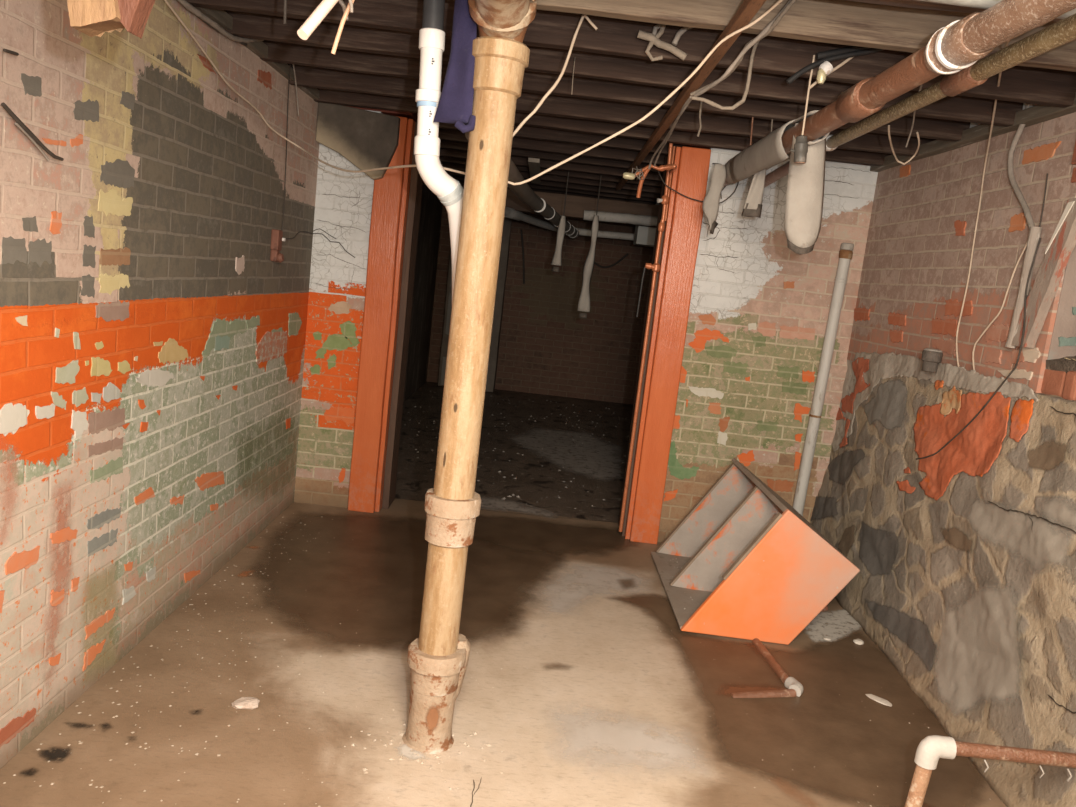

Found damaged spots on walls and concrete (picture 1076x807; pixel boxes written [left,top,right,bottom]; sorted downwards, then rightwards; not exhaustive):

peeling [2,211,62,267]
peeling [81,159,135,322]
peeling [202,312,302,364]
peeling [310,301,360,375]
peeling [0,332,188,484]
peeling [664,366,730,501]
peeling [896,380,1034,500]
peeling [5,507,121,575]
water stain [255,515,429,647]
rust [426,707,439,731]
water stain [459,516,949,807]
water stain [922,756,983,807]